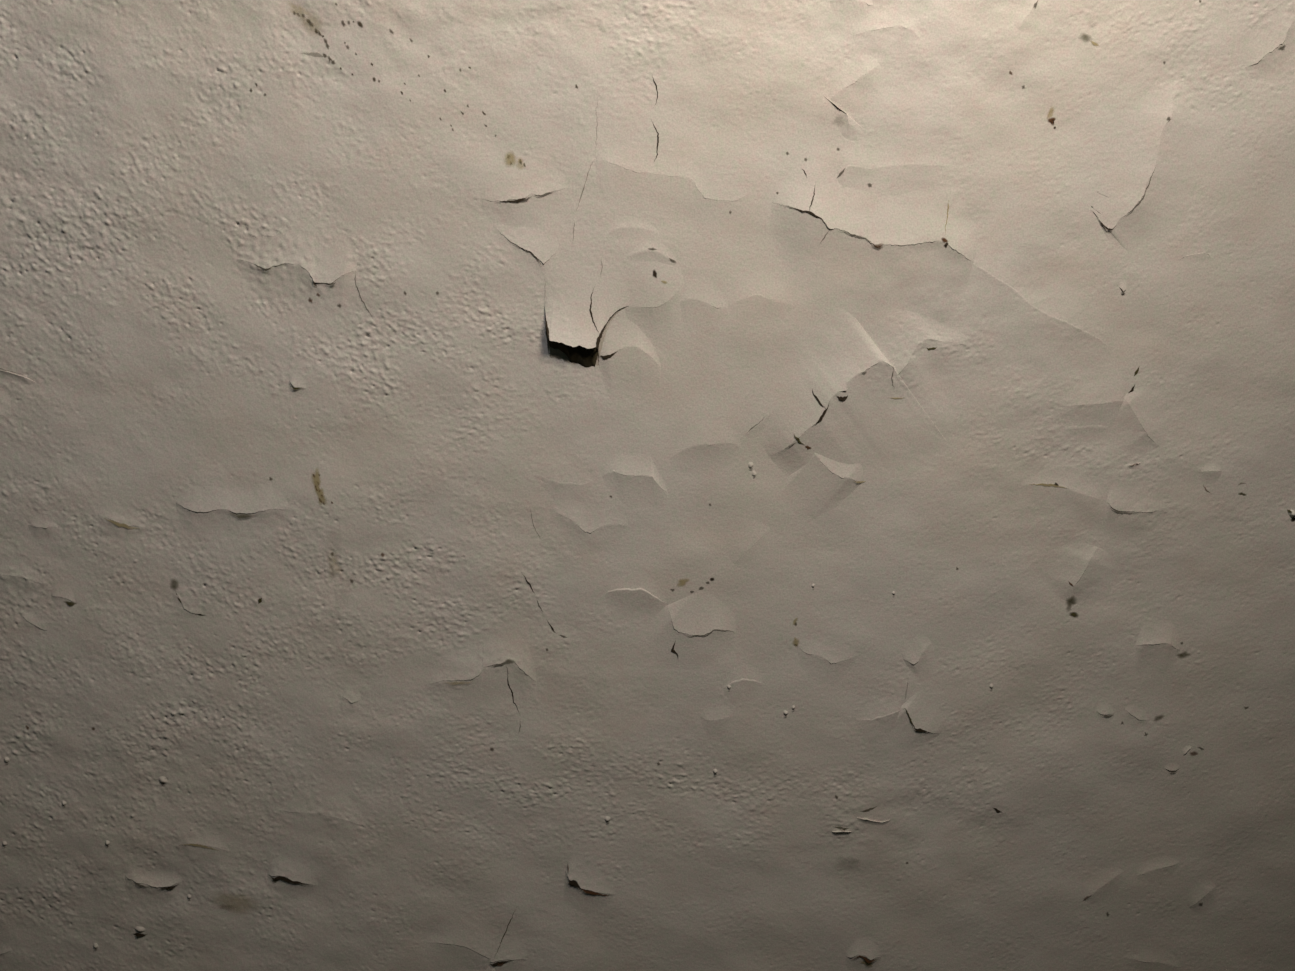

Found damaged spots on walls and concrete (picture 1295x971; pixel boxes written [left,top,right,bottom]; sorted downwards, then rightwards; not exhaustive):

peeling [236,225,372,321]
peeling [480,155,661,405]
peeling [760,307,987,507]
peeling [124,863,182,909]
peeling [845,938,882,971]